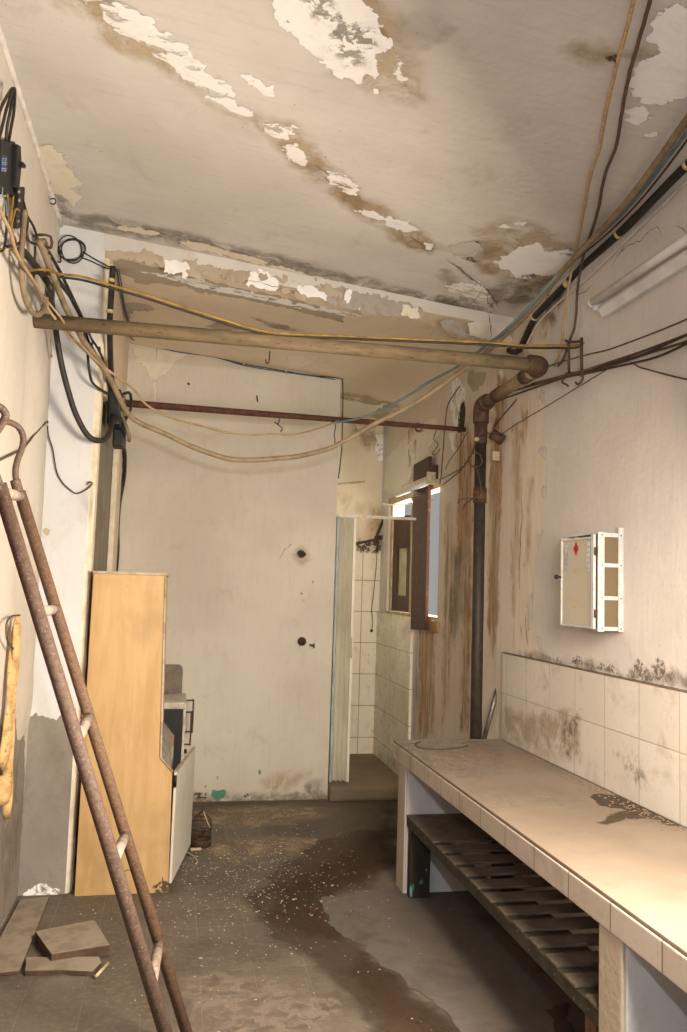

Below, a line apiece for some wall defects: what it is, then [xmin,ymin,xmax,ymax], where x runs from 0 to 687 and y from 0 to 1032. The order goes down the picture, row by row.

peeling [83,0,254,117]
peeling [271,0,408,95]
peeling [623,2,687,137]
leakage [260,123,378,214]
leakage [64,214,354,284]
peeling [105,248,424,323]
peeling [354,210,434,253]
peeling [492,242,574,281]
corrosion [488,400,506,643]
leakage [633,659,687,686]
leakage [591,794,681,826]
leakage [248,829,460,1032]